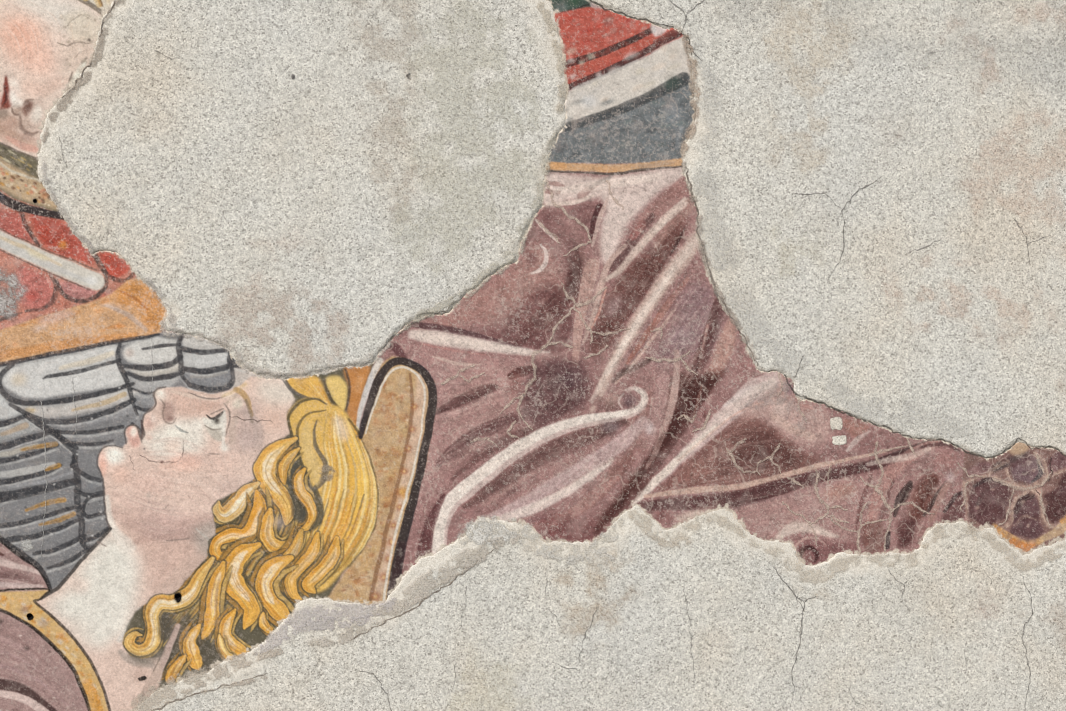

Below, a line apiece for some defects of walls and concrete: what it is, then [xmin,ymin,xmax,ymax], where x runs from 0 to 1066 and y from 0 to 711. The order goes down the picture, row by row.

spalling [42,16,111,142]
crack [590,0,703,58]
spalling [160,132,558,379]
crack [539,180,592,256]
crack [473,283,698,447]
crack [677,409,711,432]
peeling [830,417,846,445]
crack [686,170,1066,554]
spalling [131,511,1066,711]
crack [776,570,816,707]